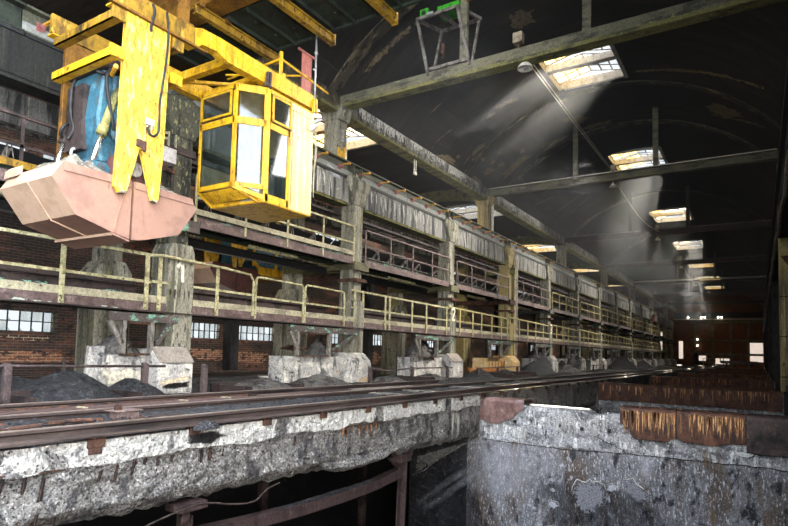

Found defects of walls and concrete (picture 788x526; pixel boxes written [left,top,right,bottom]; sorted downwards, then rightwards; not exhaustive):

spalling [342,421,381,437]
rust [623,410,743,438]
spalling [188,431,226,463]
spalling [130,456,159,475]
spalling [37,469,66,503]